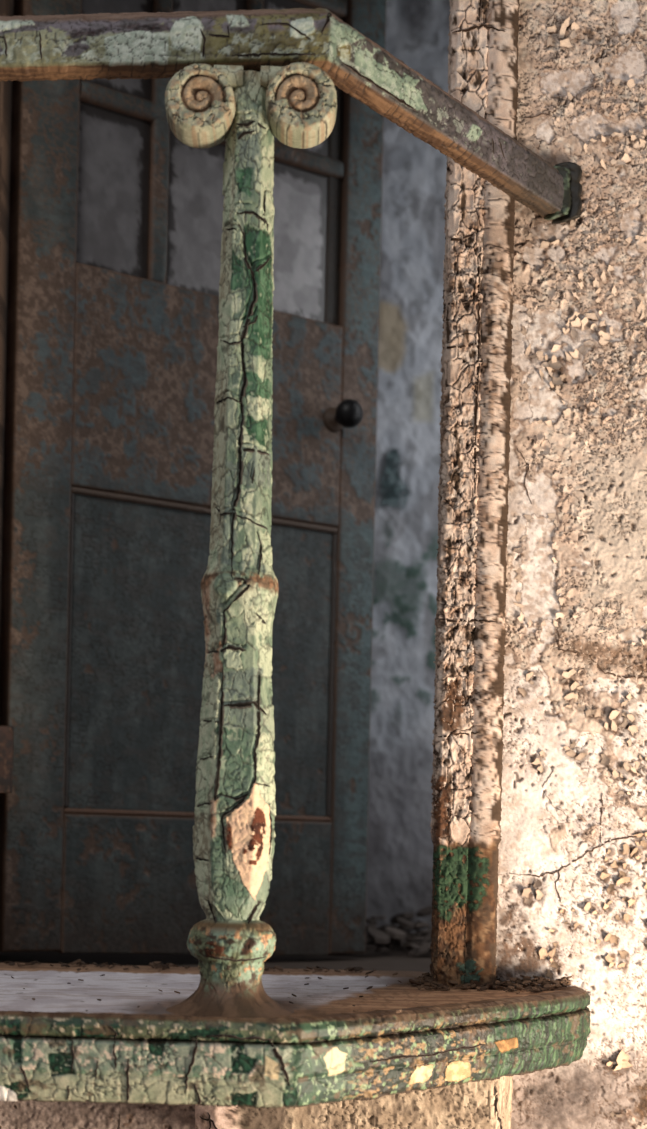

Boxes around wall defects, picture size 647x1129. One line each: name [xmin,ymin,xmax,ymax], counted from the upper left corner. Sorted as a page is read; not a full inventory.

crack [452,0,505,33]
peeling [547,16,579,48]
peeling [539,39,647,100]
peeling [567,109,647,170]
peeling [525,220,576,248]
crack [443,233,481,492]
peeling [521,265,617,427]
peeling [513,513,565,628]
peeling [561,669,647,798]
peeling [520,879,544,907]
crack [509,793,647,902]
peeling [538,830,647,980]